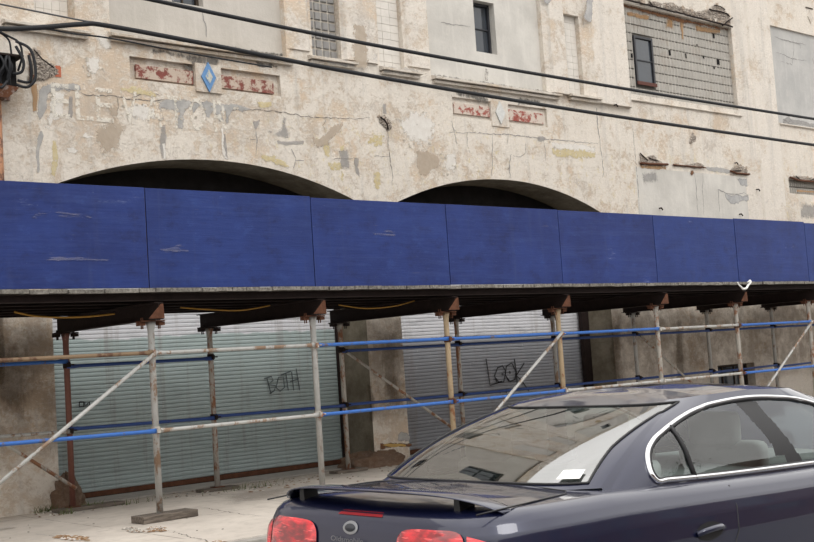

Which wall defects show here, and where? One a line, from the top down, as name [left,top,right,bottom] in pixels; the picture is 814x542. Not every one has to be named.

spalling [624,0,733,30]
peeling [83,86,272,154]
peeling [313,123,344,181]
peeling [368,104,457,175]
spalling [639,153,706,175]
spalling [730,164,750,176]
spalling [789,175,814,193]